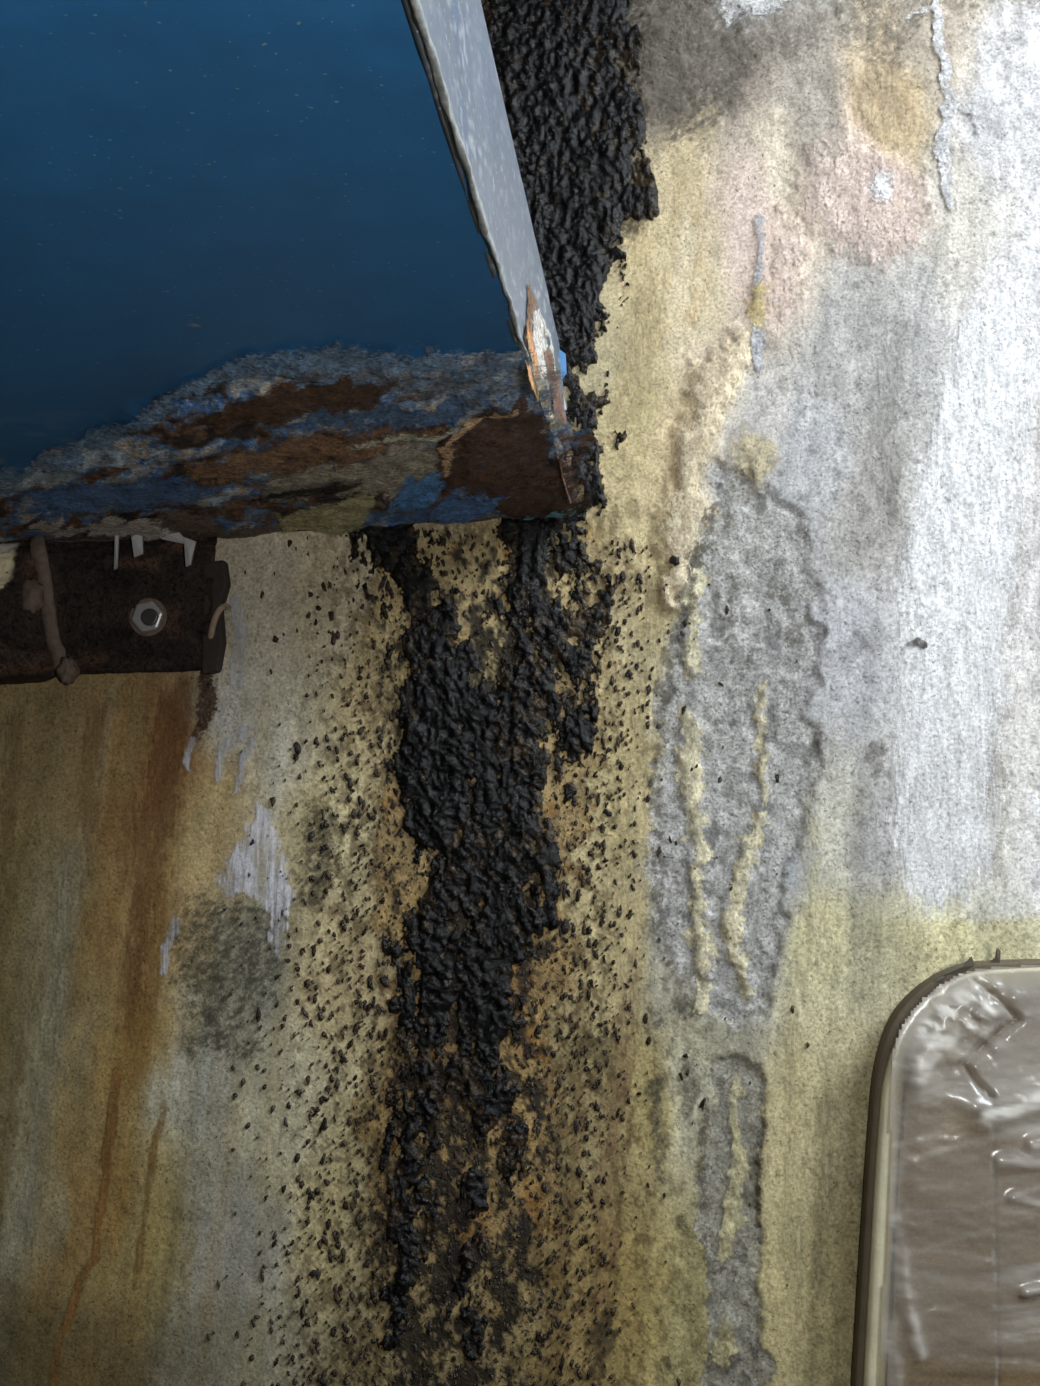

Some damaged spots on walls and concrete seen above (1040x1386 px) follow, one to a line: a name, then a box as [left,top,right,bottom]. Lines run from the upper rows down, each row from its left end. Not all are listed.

rust [50,508,306,543]
rust [183,284,578,523]
leakage [160,0,980,1386]
leakage [886,292,1040,913]
rust [122,672,217,1044]
rust [51,1066,122,1386]
rust [135,1110,166,1282]